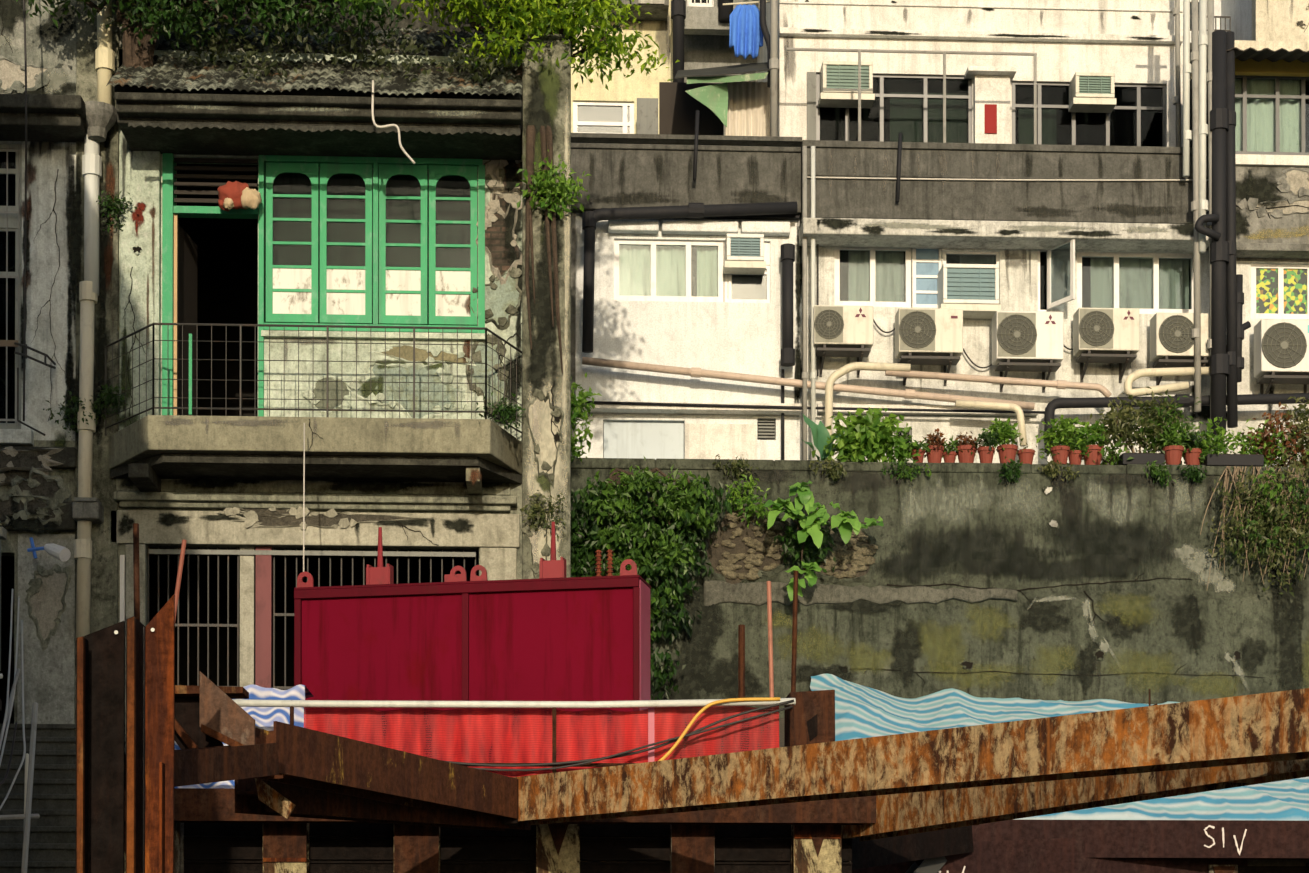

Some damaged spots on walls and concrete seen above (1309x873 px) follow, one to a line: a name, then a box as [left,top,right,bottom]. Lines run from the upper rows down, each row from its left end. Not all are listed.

flaking render [0,55,54,94]
flaking render [1237,166,1309,218]
flaking render [303,159,522,419]
water stain [490,62,603,563]
spalling [0,446,72,526]
water stain [176,479,260,489]
water stain [323,481,439,493]
flaking render [521,389,564,579]
water stain [727,469,792,489]
flaking render [25,564,72,651]
water stain [791,470,1235,695]
water stain [1194,557,1309,692]